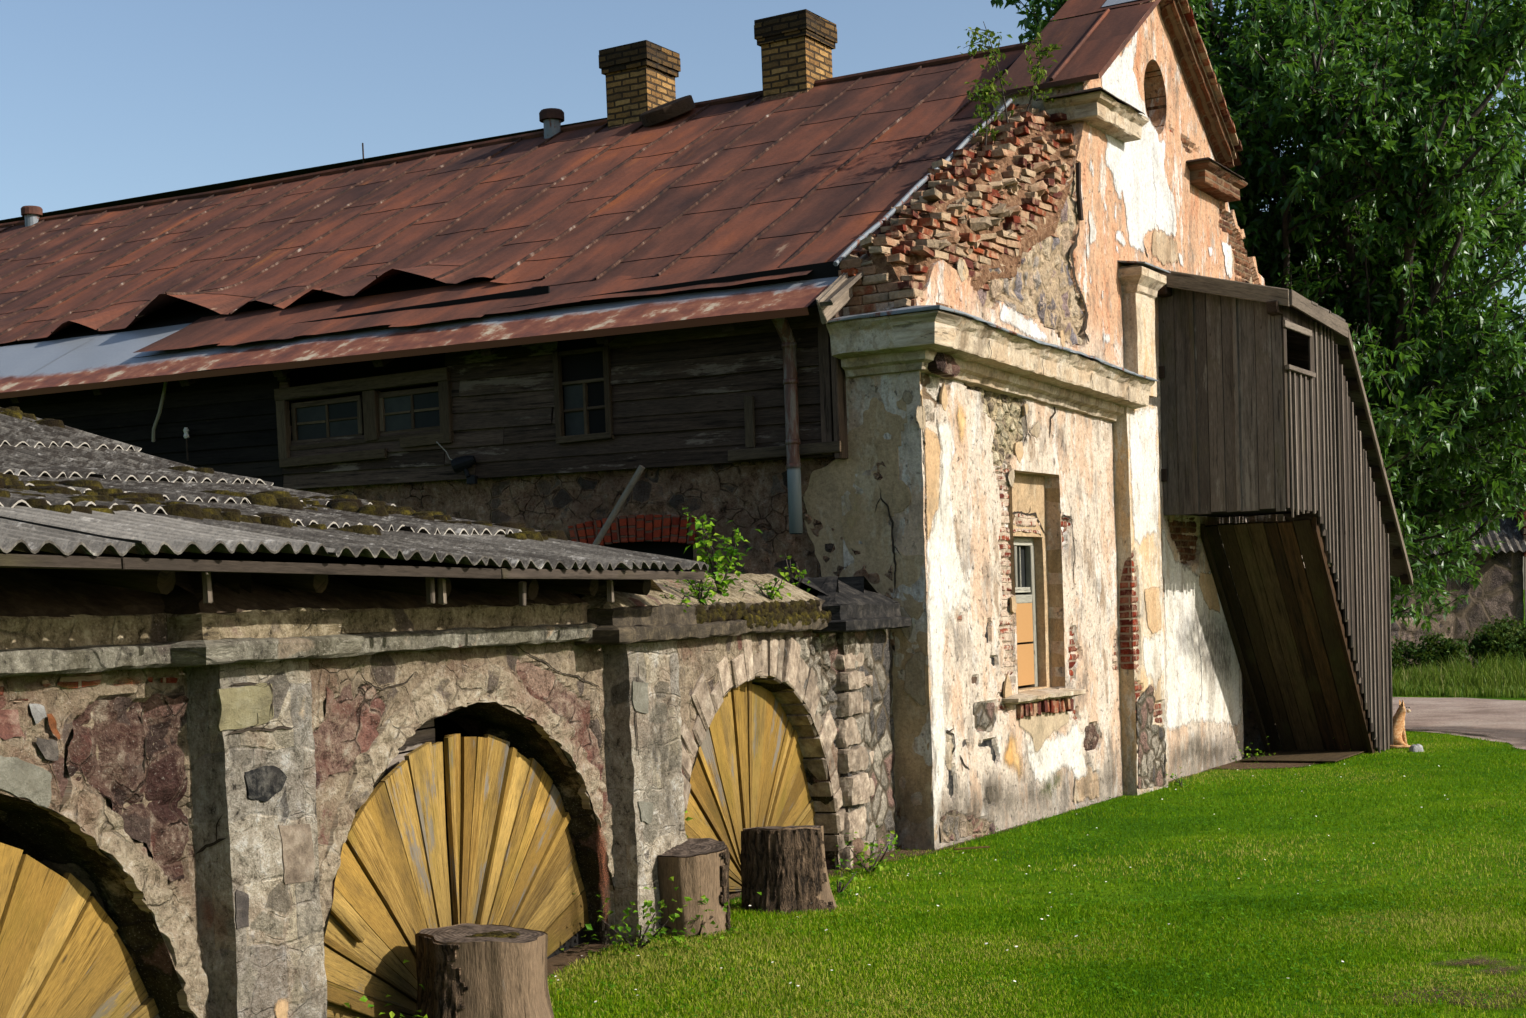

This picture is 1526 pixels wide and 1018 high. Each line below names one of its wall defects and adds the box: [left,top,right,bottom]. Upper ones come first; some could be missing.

spalling [854,121,1097,297]
peeling [1000,304,1065,347]
crack [875,490,900,593]
spalling [940,383,1040,843]
spalling [1068,627,1079,682]
spalling [1112,551,1167,789]